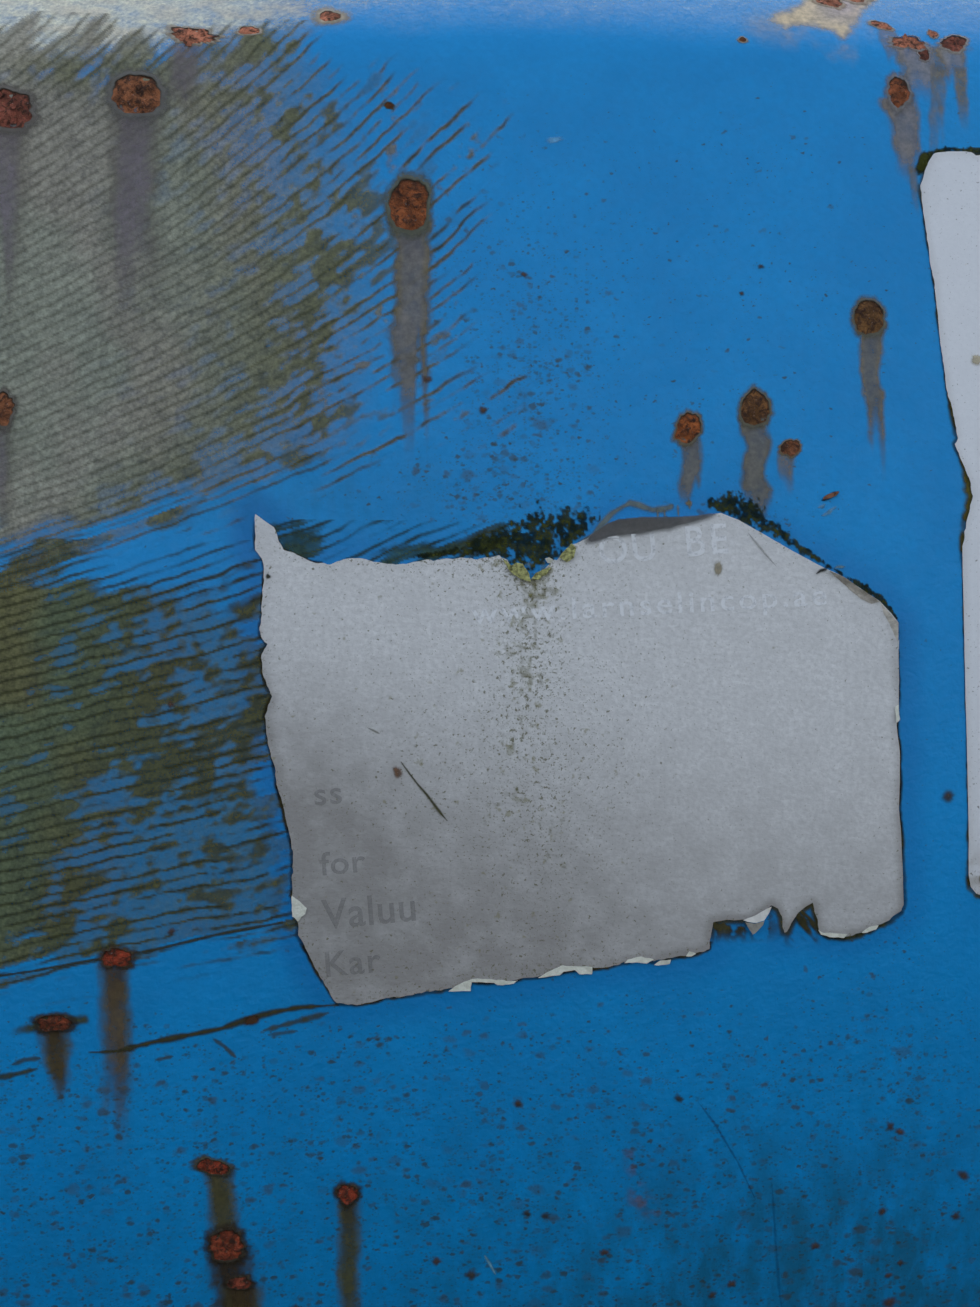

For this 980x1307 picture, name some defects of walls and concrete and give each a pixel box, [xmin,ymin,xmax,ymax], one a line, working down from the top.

rust [0,83,40,260]
rust [106,25,262,255]
rust [383,172,434,407]
rust [851,297,887,438]
rust [672,410,703,496]
rust [738,386,802,508]
rust [21,1012,88,1091]
rust [99,945,136,1090]
rust [192,1155,259,1307]
rust [334,1182,362,1307]